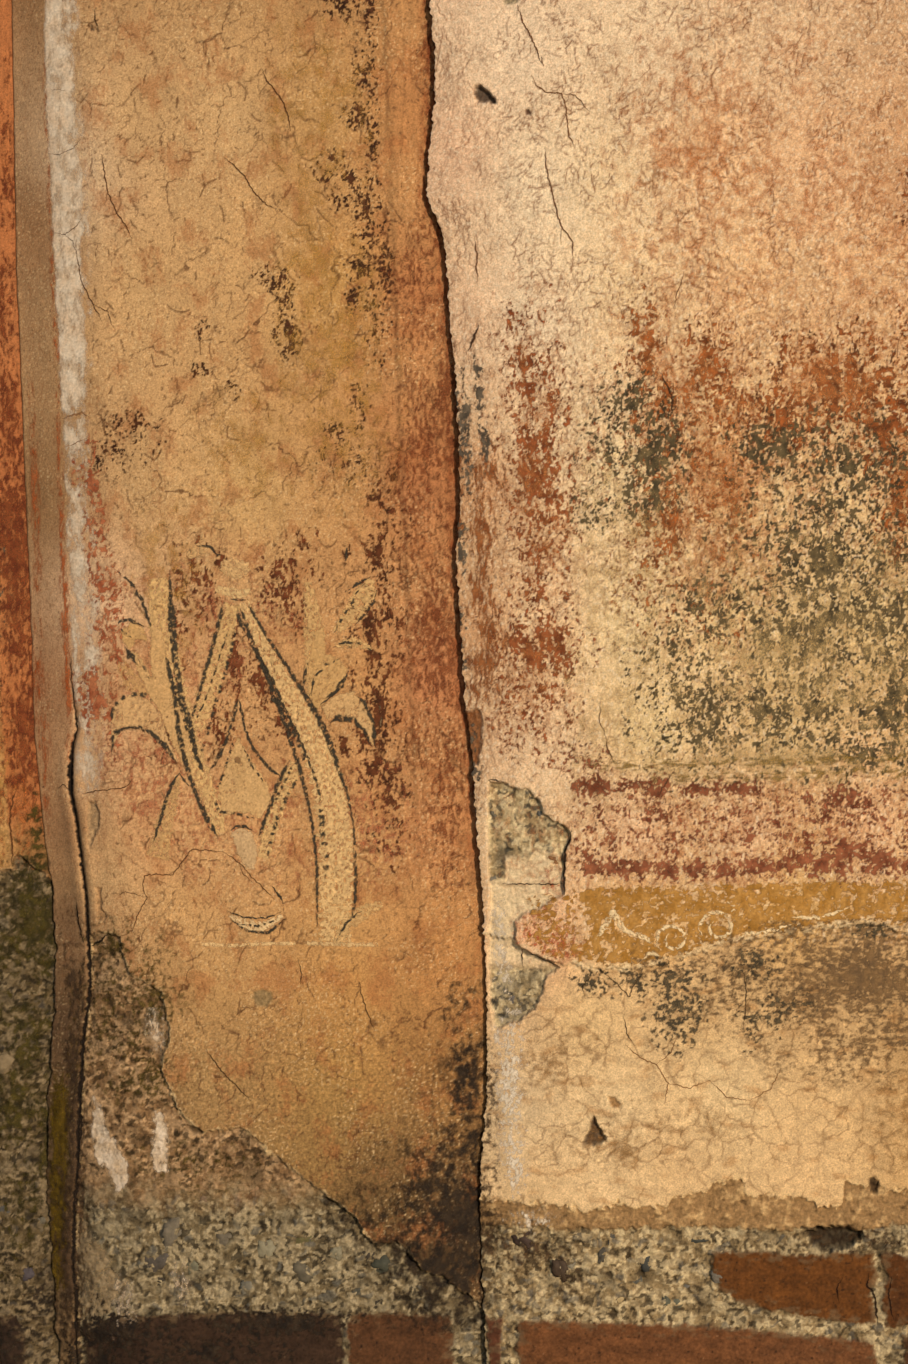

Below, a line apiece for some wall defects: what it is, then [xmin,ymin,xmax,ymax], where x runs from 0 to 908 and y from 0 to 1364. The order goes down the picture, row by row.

crack [54,140,132,328]
crack [229,161,277,209]
crack [261,68,291,131]
leakage [454,355,491,576]
leakage [569,369,704,535]
leakage [603,399,908,790]
crack [503,831,572,895]
flaking render [487,767,908,1030]
flaking render [0,855,60,1364]
flaking render [76,887,908,1364]
crack [521,951,780,1101]